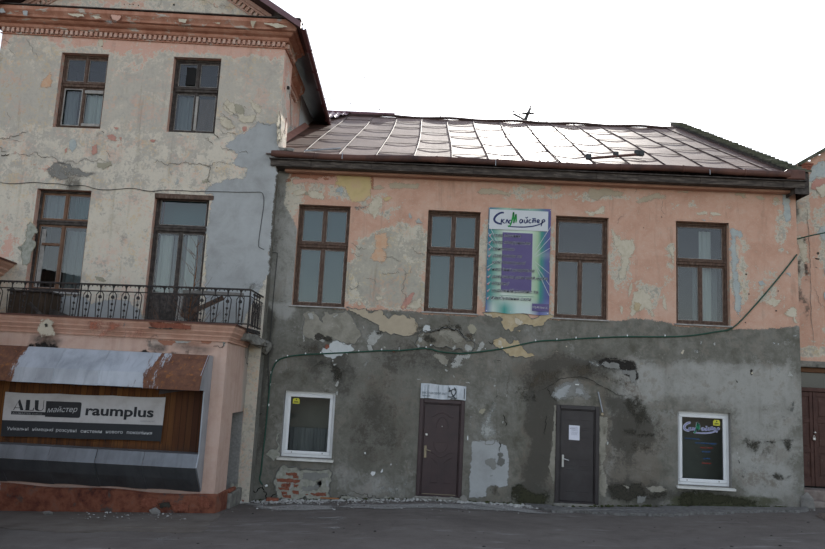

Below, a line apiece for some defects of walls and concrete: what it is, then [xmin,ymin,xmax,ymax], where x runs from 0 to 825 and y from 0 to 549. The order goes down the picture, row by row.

flaking render [809,161,825,198]
flaking render [18,222,38,266]
peeling [611,229,655,320]
peeling [728,227,750,323]
flaking render [302,296,422,365]
flaking render [433,312,554,378]
flaking render [266,433,392,501]
leakage [609,482,667,503]